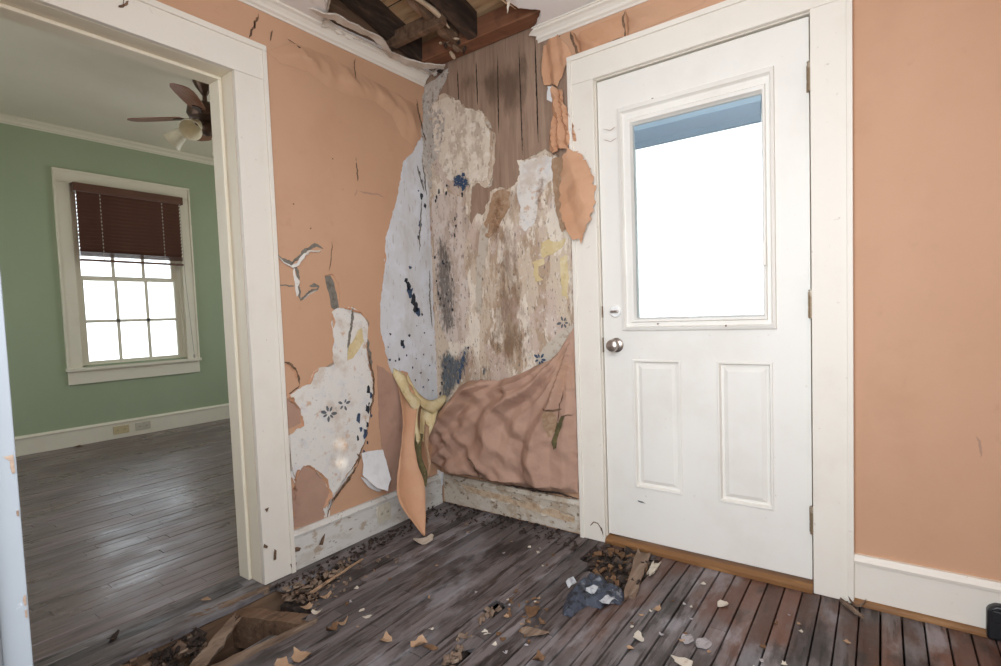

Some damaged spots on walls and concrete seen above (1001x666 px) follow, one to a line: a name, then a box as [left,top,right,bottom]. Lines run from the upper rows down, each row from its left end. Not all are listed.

leakage [435,173,469,203]
leakage [434,240,453,331]
peeling [286,394,354,512]